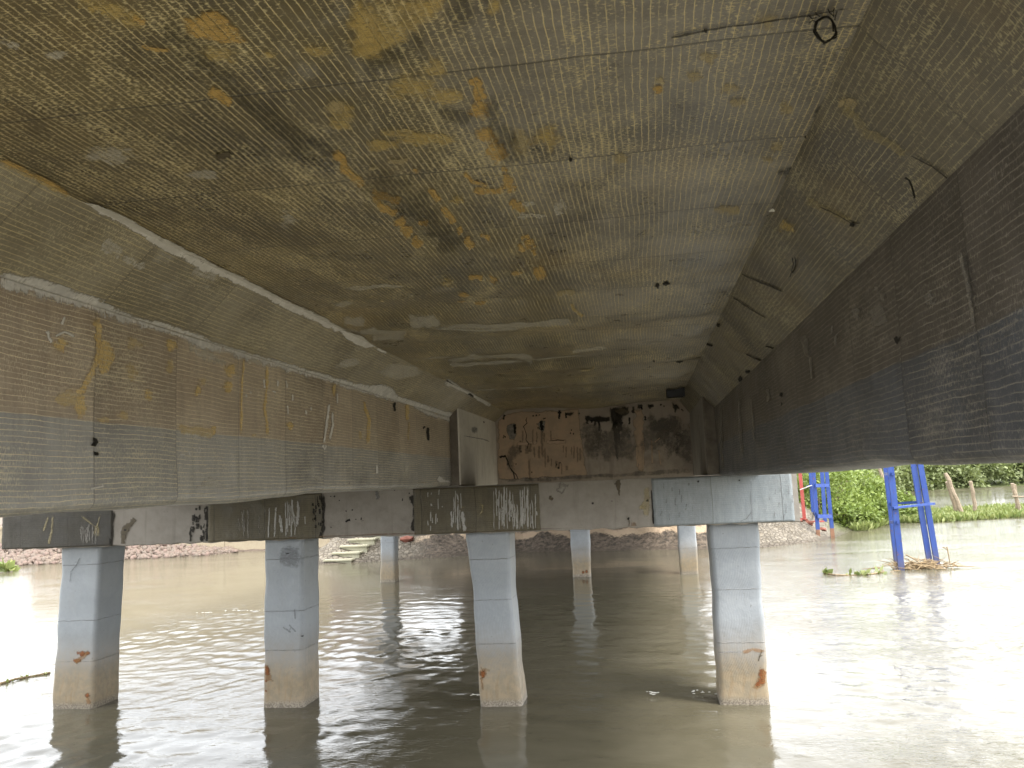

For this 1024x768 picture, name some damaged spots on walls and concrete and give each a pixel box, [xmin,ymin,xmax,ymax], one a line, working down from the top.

leakage [585,403,684,459]